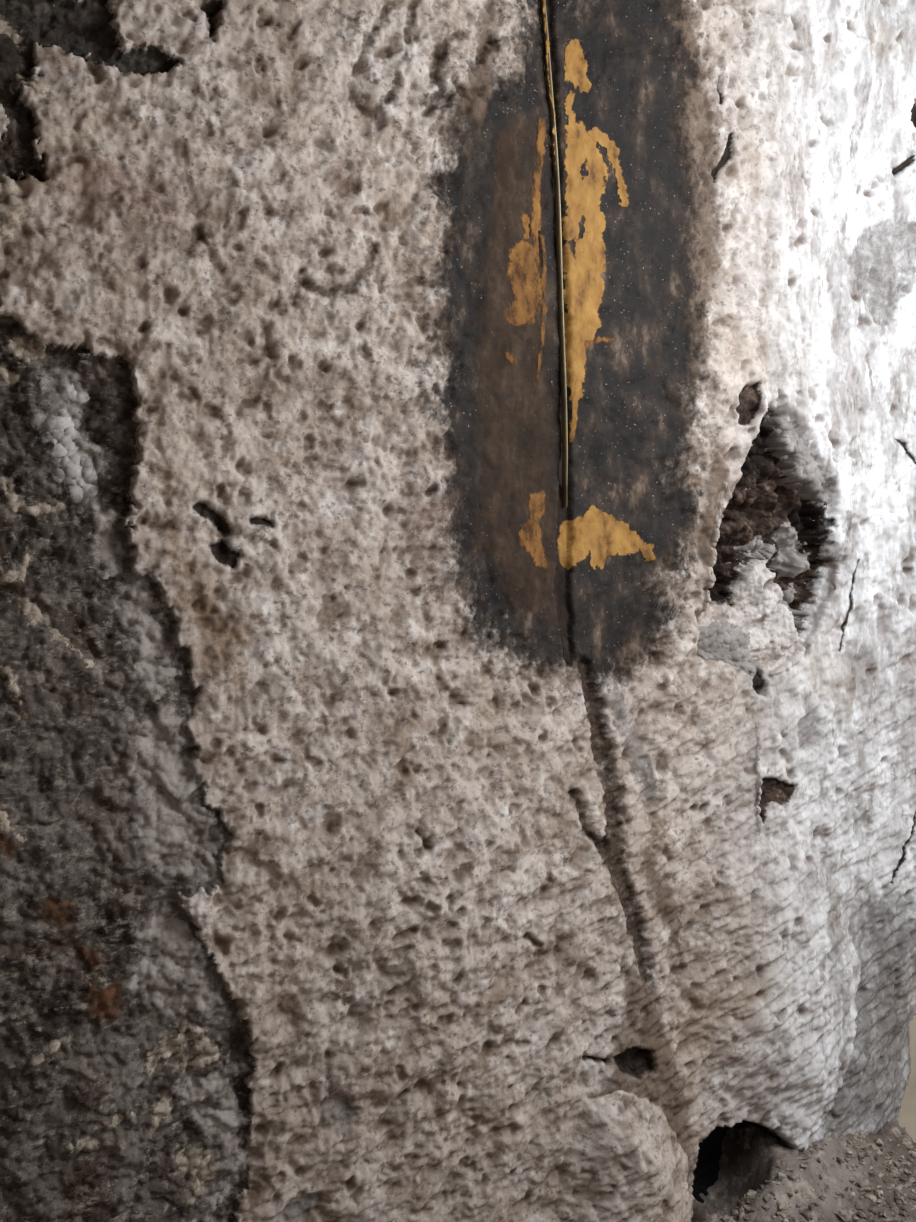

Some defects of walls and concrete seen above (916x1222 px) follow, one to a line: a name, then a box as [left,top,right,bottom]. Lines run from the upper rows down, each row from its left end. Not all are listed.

flaking render [0,0,179,244]
flaking render [204,0,223,32]
crack [538,0,567,336]
rust [504,3,629,443]
water stain [426,0,721,686]
flaking render [0,315,256,1222]
spalling [250,516,275,528]
rust [519,491,656,570]
crack [554,367,682,986]
spalling [697,382,847,694]
spalling [691,1126,729,1203]
spalling [742,1120,788,1146]